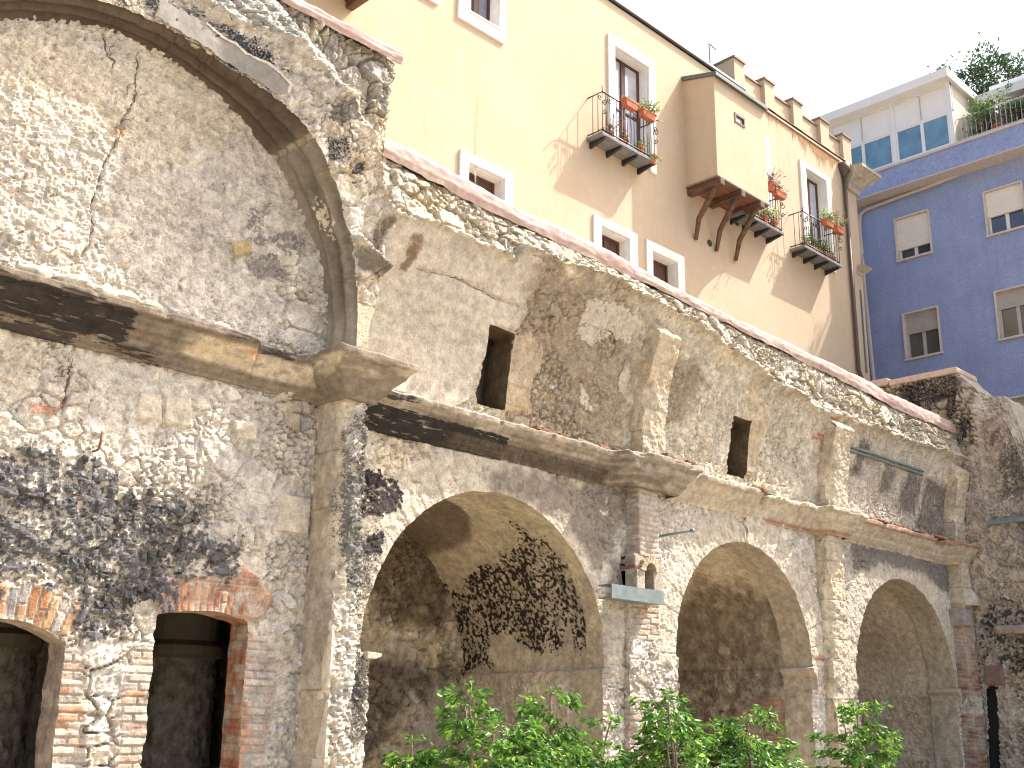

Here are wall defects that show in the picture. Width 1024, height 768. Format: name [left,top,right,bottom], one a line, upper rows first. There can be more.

crack [70,36,139,258]
damp [0,441,247,643]
damp [329,408,453,755]
damp [522,528,590,656]